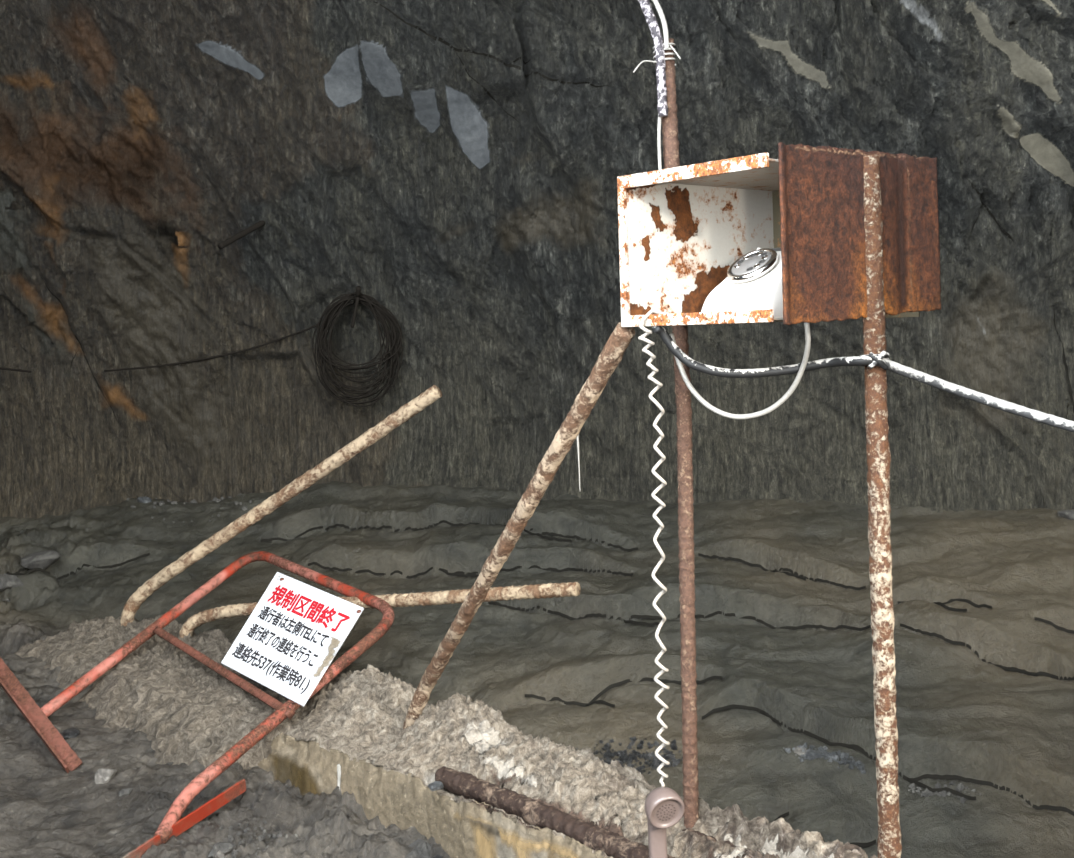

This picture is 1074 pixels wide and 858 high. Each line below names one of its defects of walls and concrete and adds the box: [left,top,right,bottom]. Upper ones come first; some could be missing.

rust [175,231,185,254]
spalling [462,720,538,787]
rust [464,797,543,830]
rust [523,794,624,837]